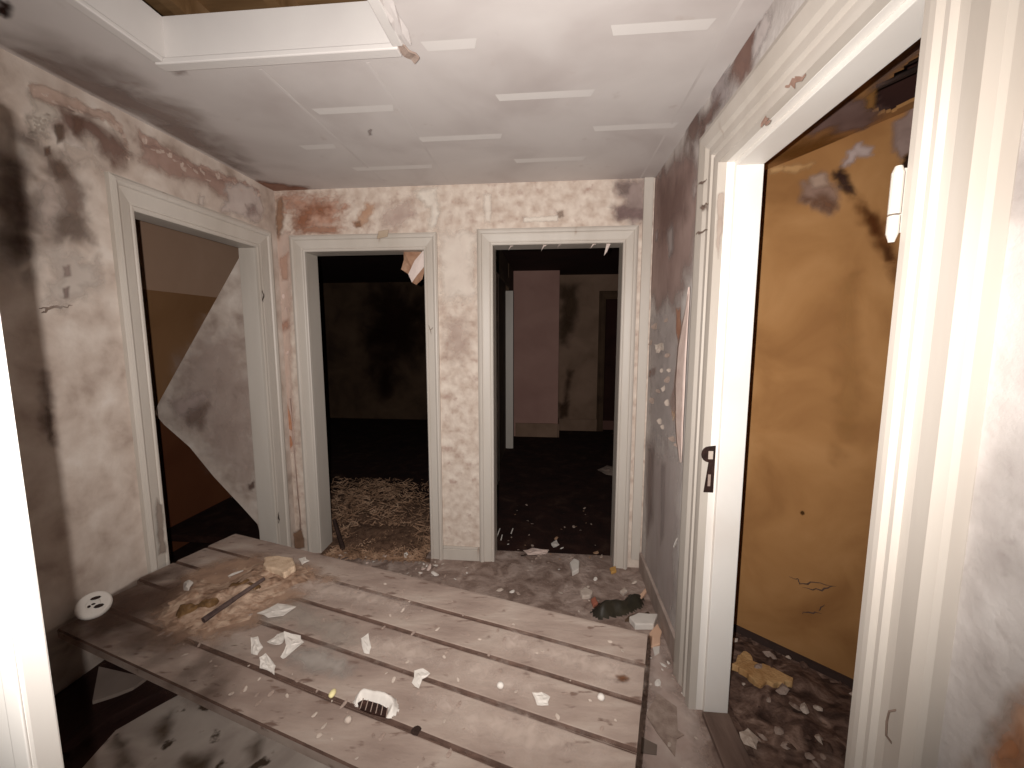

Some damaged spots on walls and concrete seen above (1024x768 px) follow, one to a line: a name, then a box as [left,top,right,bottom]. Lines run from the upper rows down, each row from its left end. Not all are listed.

peeling [752,14,771,58]
water stain [0,160,38,261]
peeling [40,183,60,227]
peeling [28,84,131,161]
water stain [45,109,126,238]
peeling [139,131,263,222]
water stain [775,140,836,159]
water stain [833,170,853,193]
water stain [862,211,897,272]
peeling [648,287,690,463]